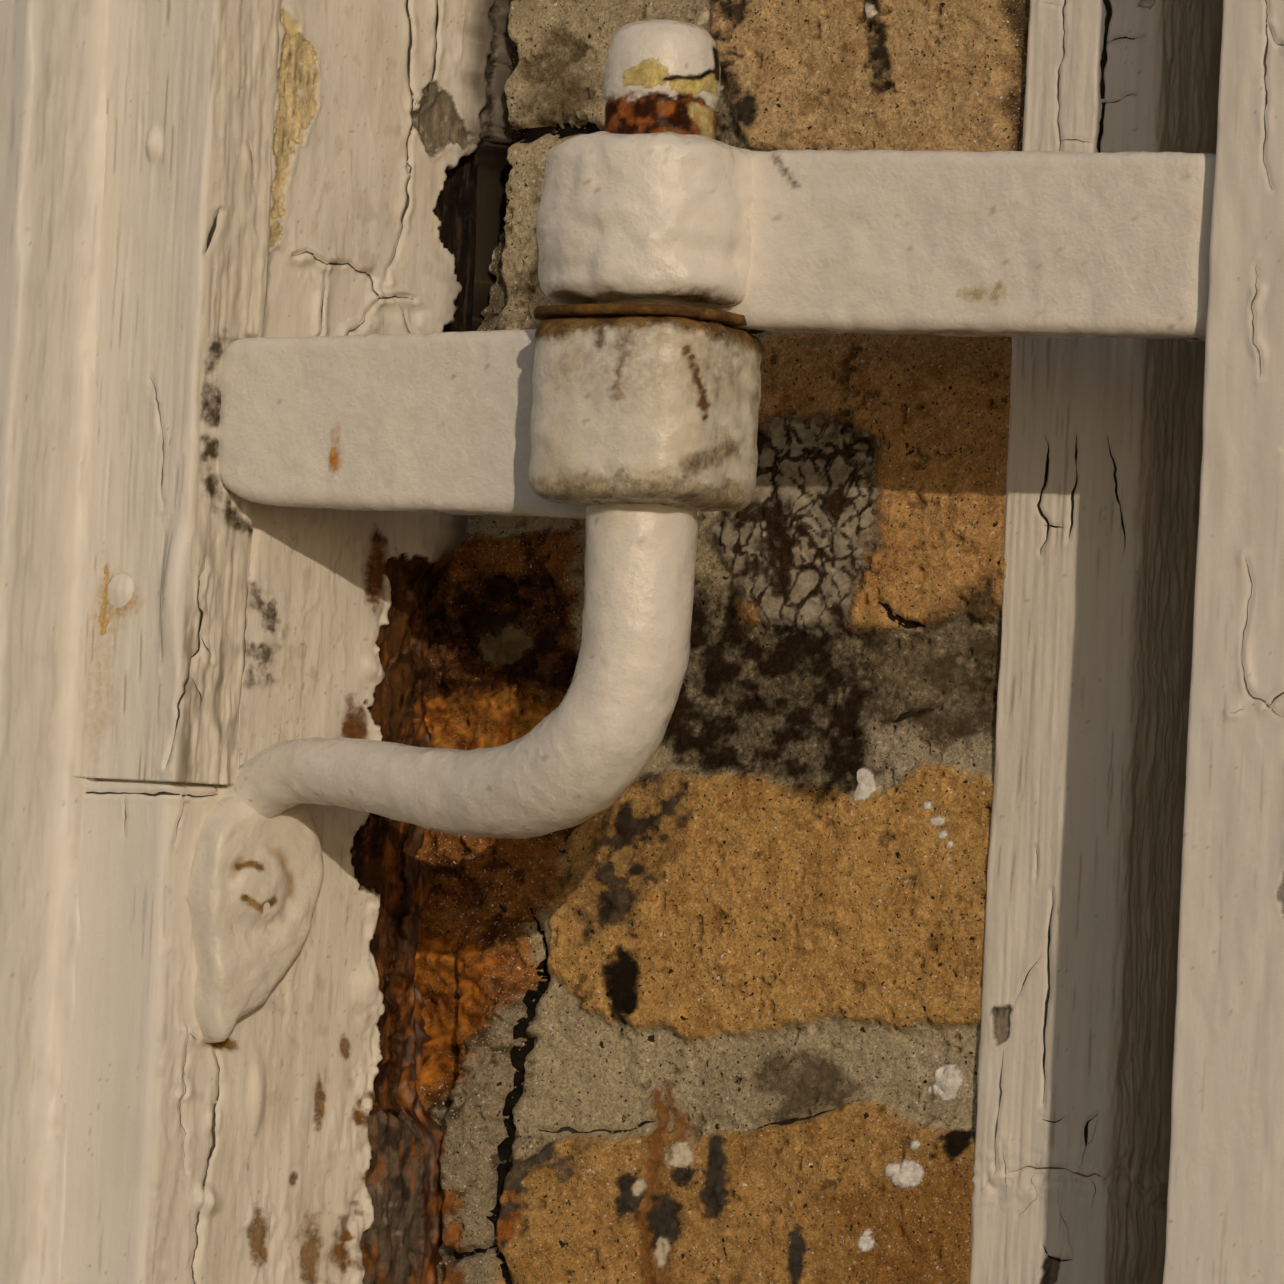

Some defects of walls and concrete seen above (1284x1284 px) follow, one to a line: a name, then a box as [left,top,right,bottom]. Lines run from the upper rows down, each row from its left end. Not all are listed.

crack [205,212,219,252]
peeling [268,10,318,255]
crack [292,0,439,336]
spalling [410,0,499,332]
rust [604,91,716,139]
crack [1051,0,1146,153]
crack [1263,0,1283,190]
rust [99,565,129,635]
rust [354,1092,376,1141]
rust [408,906,502,1089]
rust [635,1081,692,1284]
crack [994,847,1107,1284]